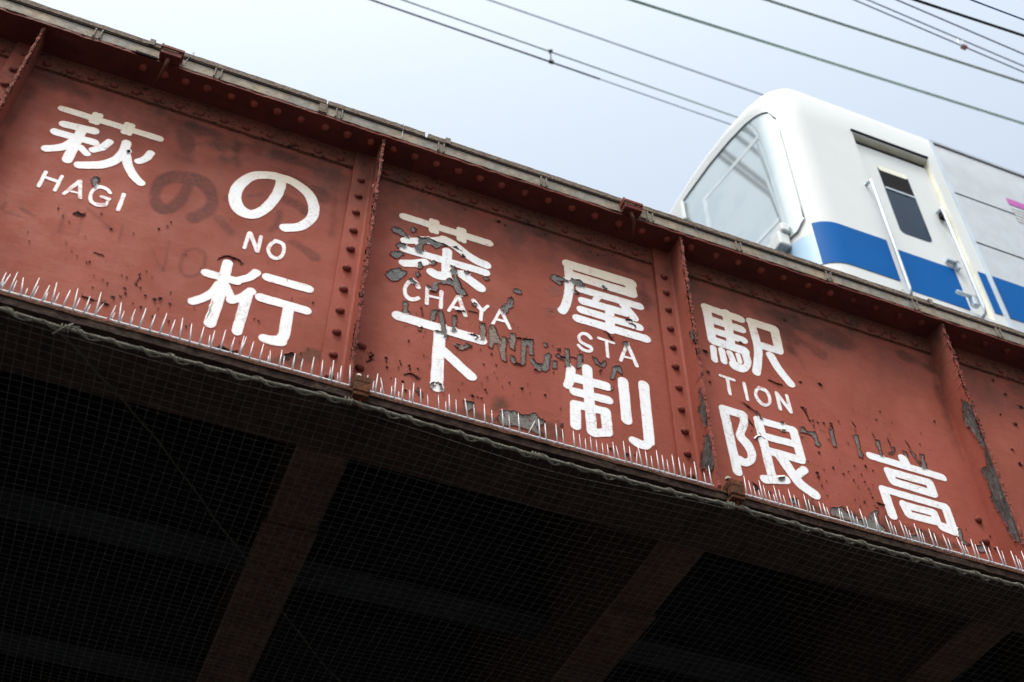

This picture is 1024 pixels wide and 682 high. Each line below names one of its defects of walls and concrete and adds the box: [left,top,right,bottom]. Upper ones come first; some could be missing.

peeling [385,226,490,307]
peeling [401,287,623,390]
peeling [496,409,546,435]
peeling [697,371,714,473]
peeling [799,406,921,541]
peeling [874,411,931,470]
peeling [940,323,1023,545]
peeling [956,526,997,553]